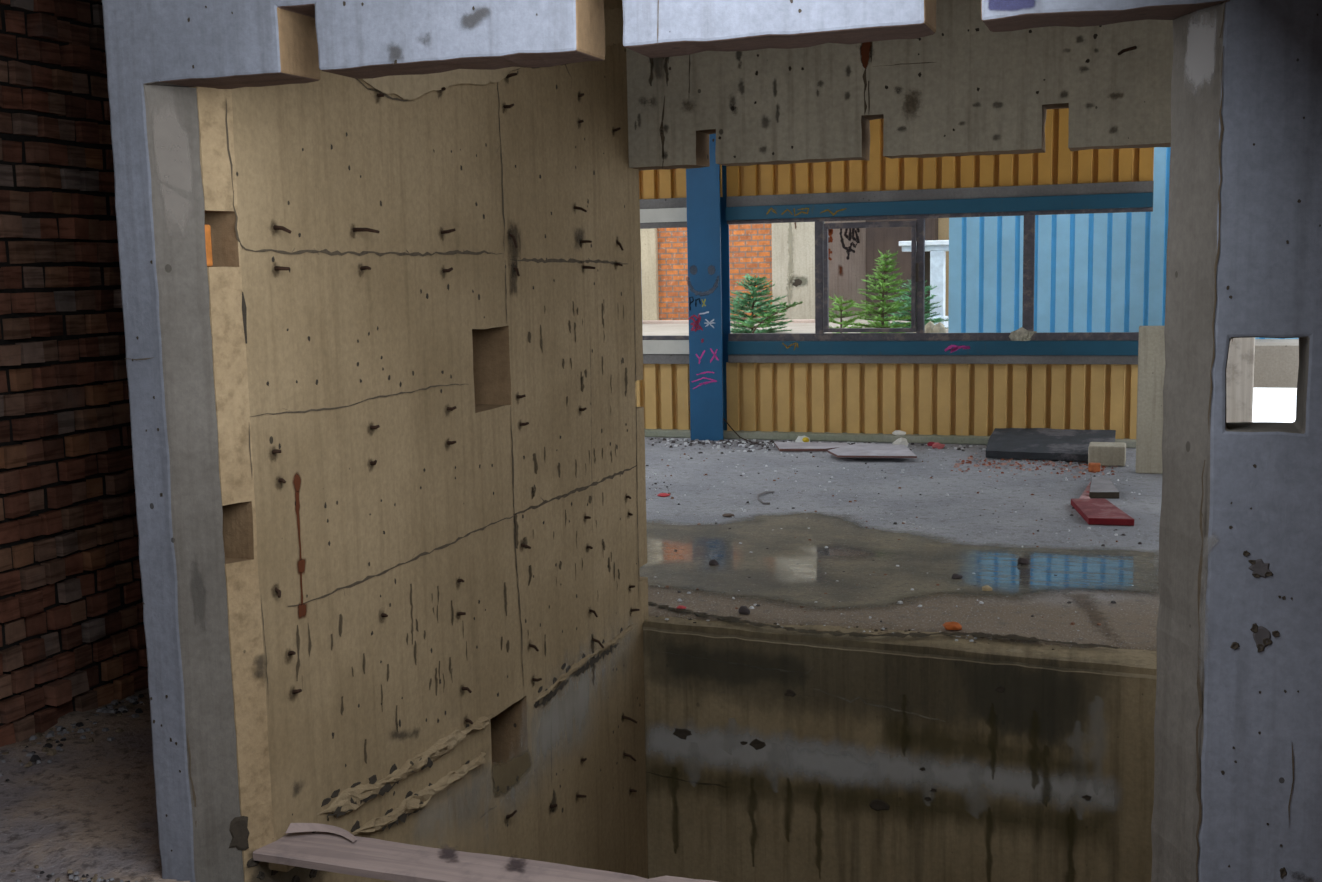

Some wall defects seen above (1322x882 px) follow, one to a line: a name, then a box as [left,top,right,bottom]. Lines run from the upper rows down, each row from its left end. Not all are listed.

corrosion [860,42,871,69]
crack [225,63,635,319]
corrosion [277,473,311,699]
spalling [321,616,1157,882]
leakage [649,694,1114,882]